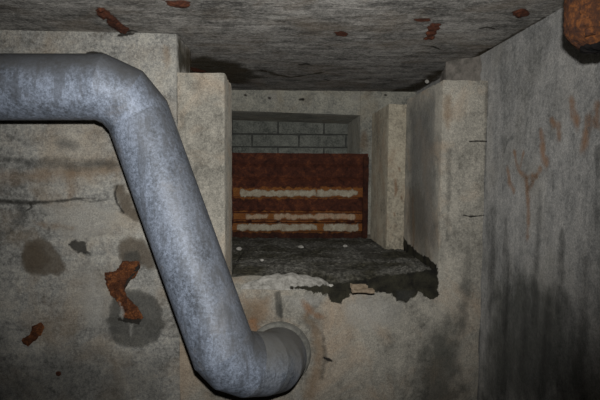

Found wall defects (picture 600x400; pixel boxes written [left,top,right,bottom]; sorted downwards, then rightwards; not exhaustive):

crack [0,198,81,211]
corrosion [233,186,363,200]
corrosion [232,210,362,234]
leakage [24,240,64,275]
leakage [69,240,88,254]
leakage [109,292,162,346]